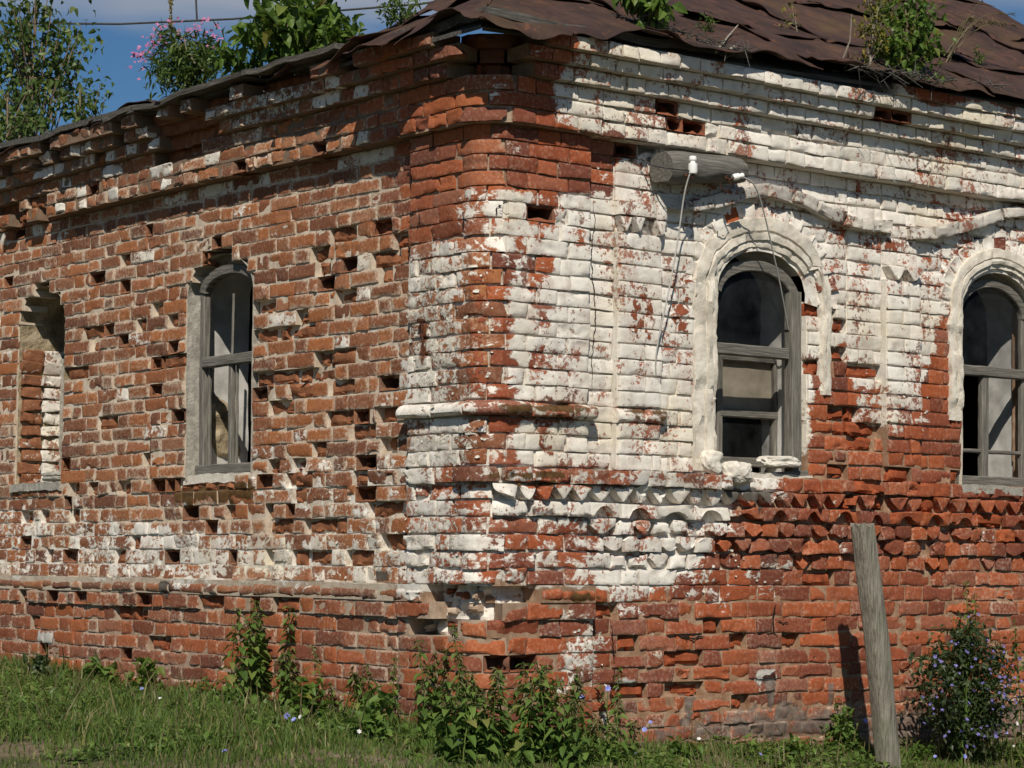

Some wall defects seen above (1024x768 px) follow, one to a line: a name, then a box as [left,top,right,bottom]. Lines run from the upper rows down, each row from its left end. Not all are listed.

spalling [623,99,705,136]
spalling [867,107,911,125]
spalling [525,204,555,223]
peeling [372,218,494,409]
spalling [827,352,928,450]
spalling [151,479,235,493]
spalling [183,506,218,534]
peeling [51,532,198,570]
spalling [228,550,238,564]
peeling [687,549,766,592]
spalling [483,655,536,672]
spalling [573,605,642,698]